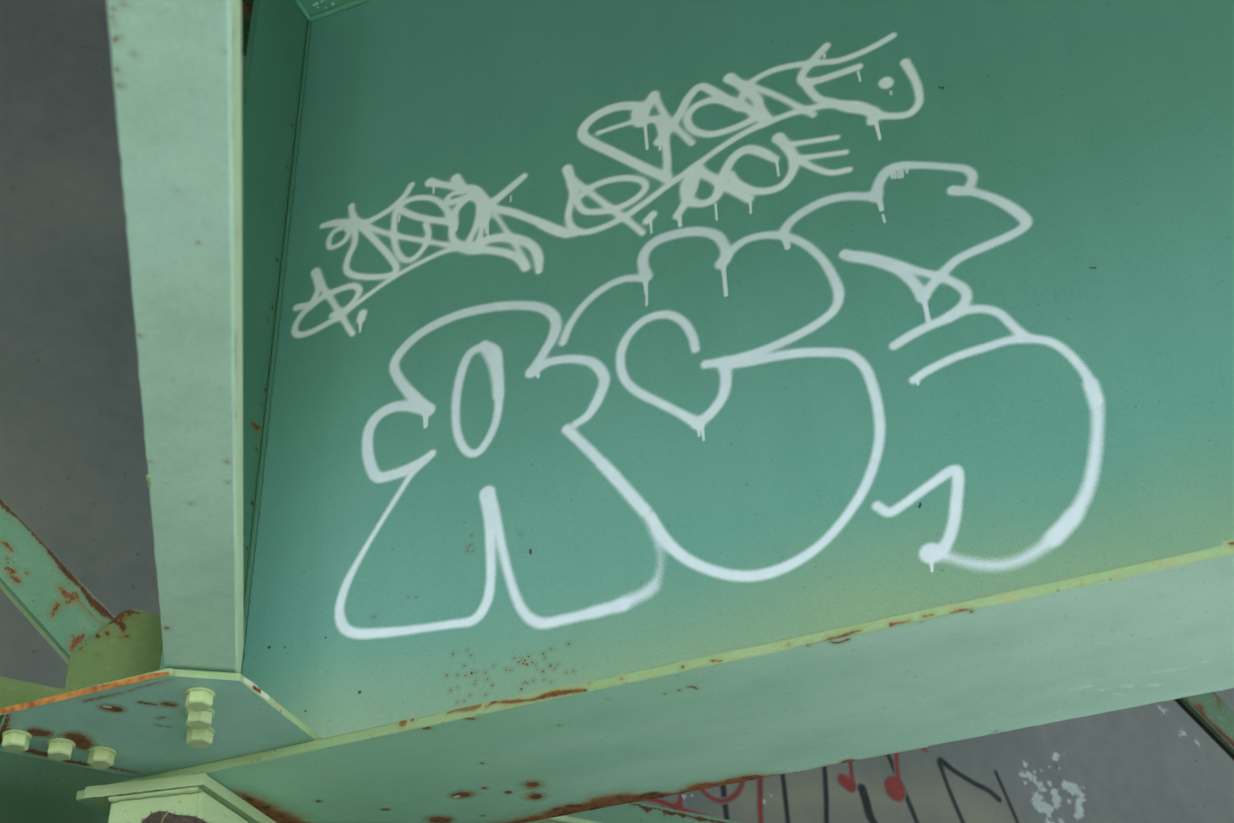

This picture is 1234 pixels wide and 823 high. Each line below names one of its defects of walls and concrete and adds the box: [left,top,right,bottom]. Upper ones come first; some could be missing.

corrosion [241,0,253,28]
corrosion [0,498,143,660]
corrosion [0,668,185,776]
corrosion [395,639,595,732]
corrosion [1184,692,1234,748]
corrosion [224,746,929,823]